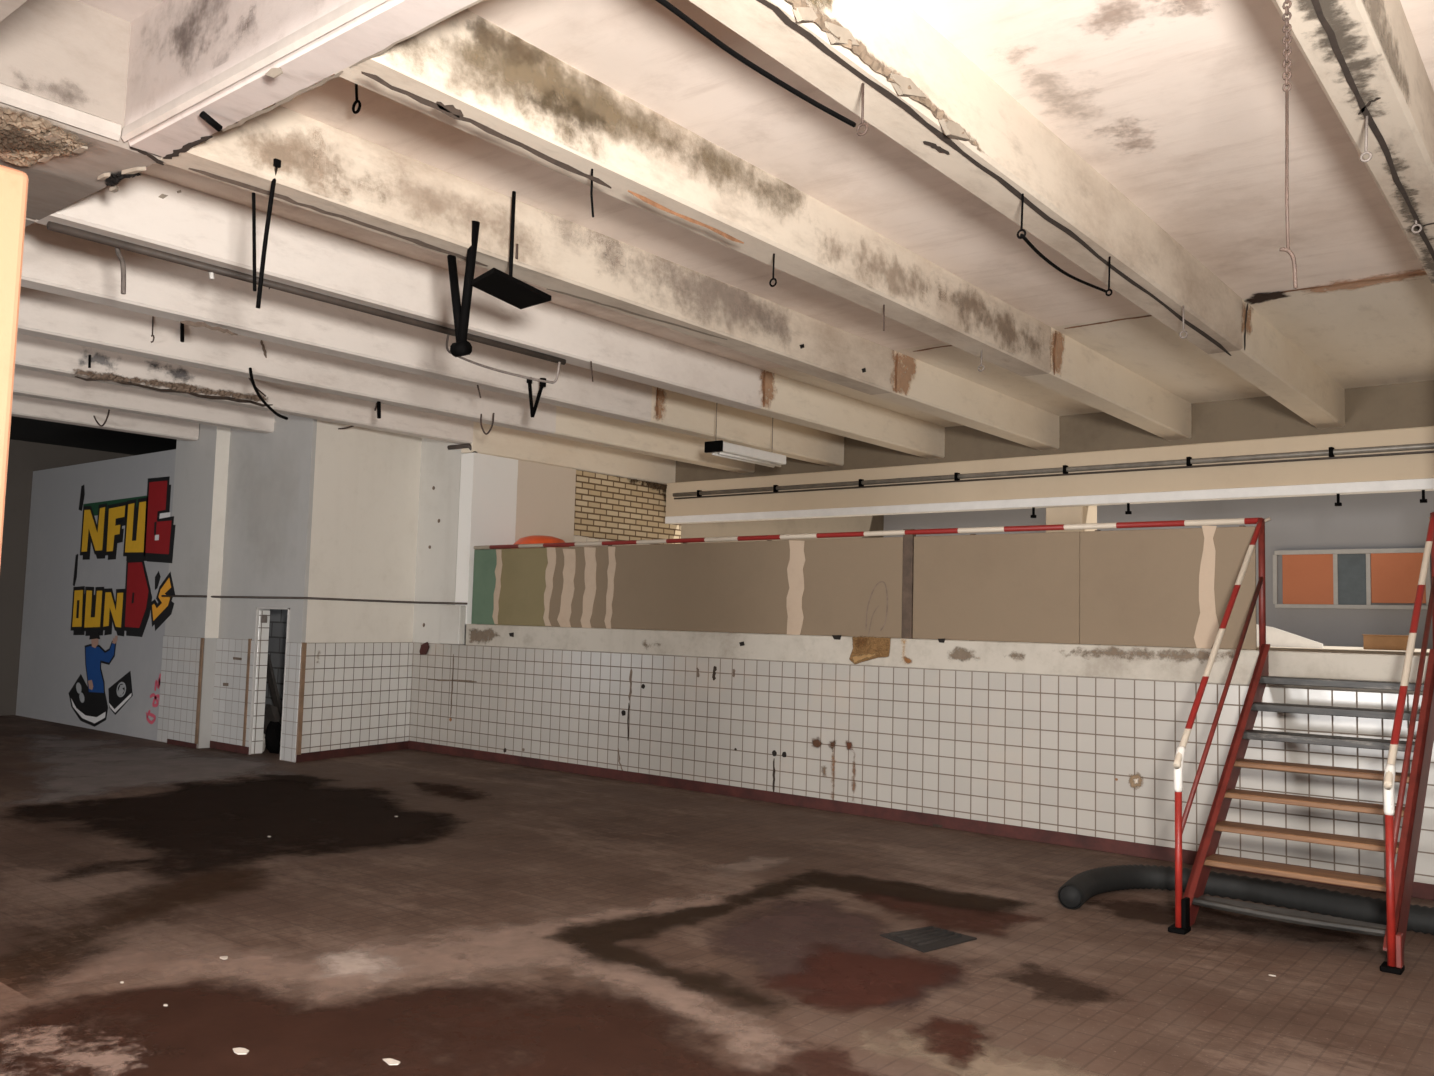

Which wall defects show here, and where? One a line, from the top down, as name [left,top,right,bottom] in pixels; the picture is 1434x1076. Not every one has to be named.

spalling [0,107,88,167]
damp [175,0,207,52]
damp [455,22,677,150]
damp [694,147,798,205]
crack [1244,0,1434,304]
damp [1298,0,1409,119]
damp [1386,158,1434,284]
damp [670,269,783,334]
damp [940,293,1039,349]
spalling [832,635,891,664]
damp [0,775,483,991]
damp [712,892,1035,1011]